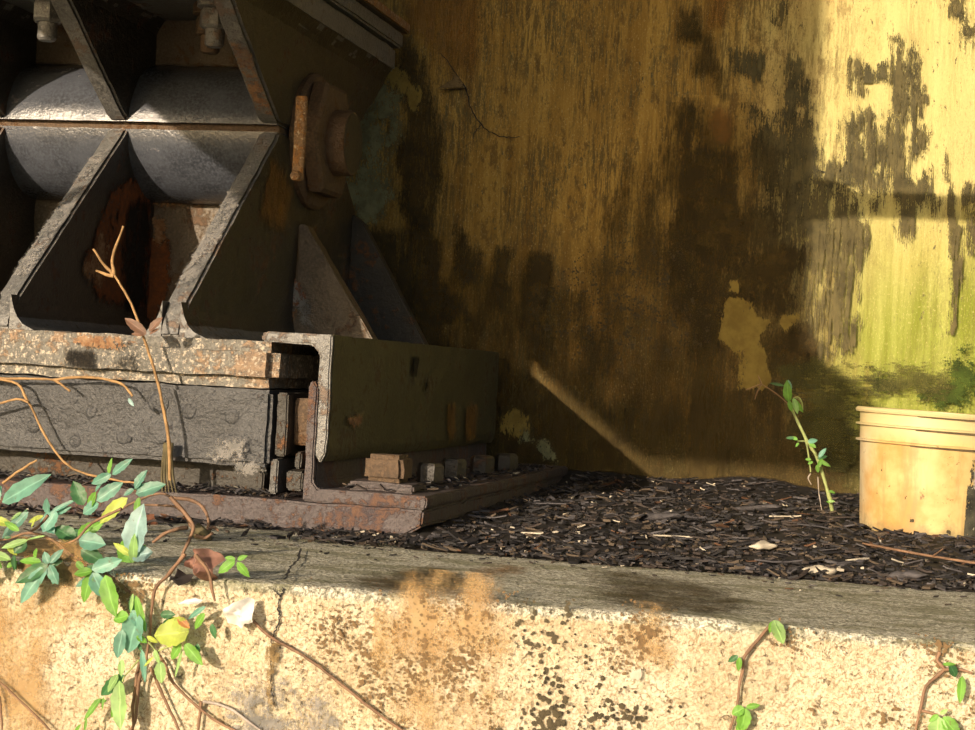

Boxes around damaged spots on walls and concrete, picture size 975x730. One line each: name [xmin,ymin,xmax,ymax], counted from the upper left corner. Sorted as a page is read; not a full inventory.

leakage [771,0,788,30]
leakage [936,0,975,51]
crack [440,54,519,145]
leakage [371,10,975,494]
peeling [718,279,800,391]
crack [270,548,302,708]